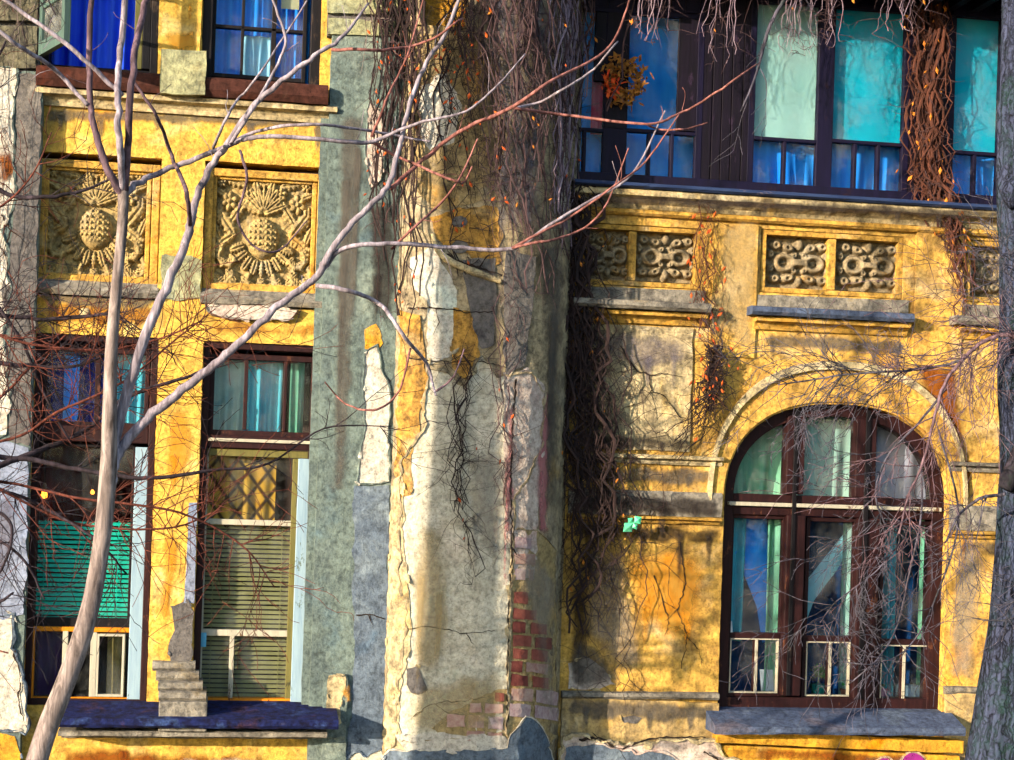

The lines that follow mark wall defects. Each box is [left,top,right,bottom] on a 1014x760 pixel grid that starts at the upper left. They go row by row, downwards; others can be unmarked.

peeling [0,66,20,438]
peeling [346,248,740,760]
crack [611,346,683,417]
leakage [572,336,970,683]
peeling [0,611,31,760]